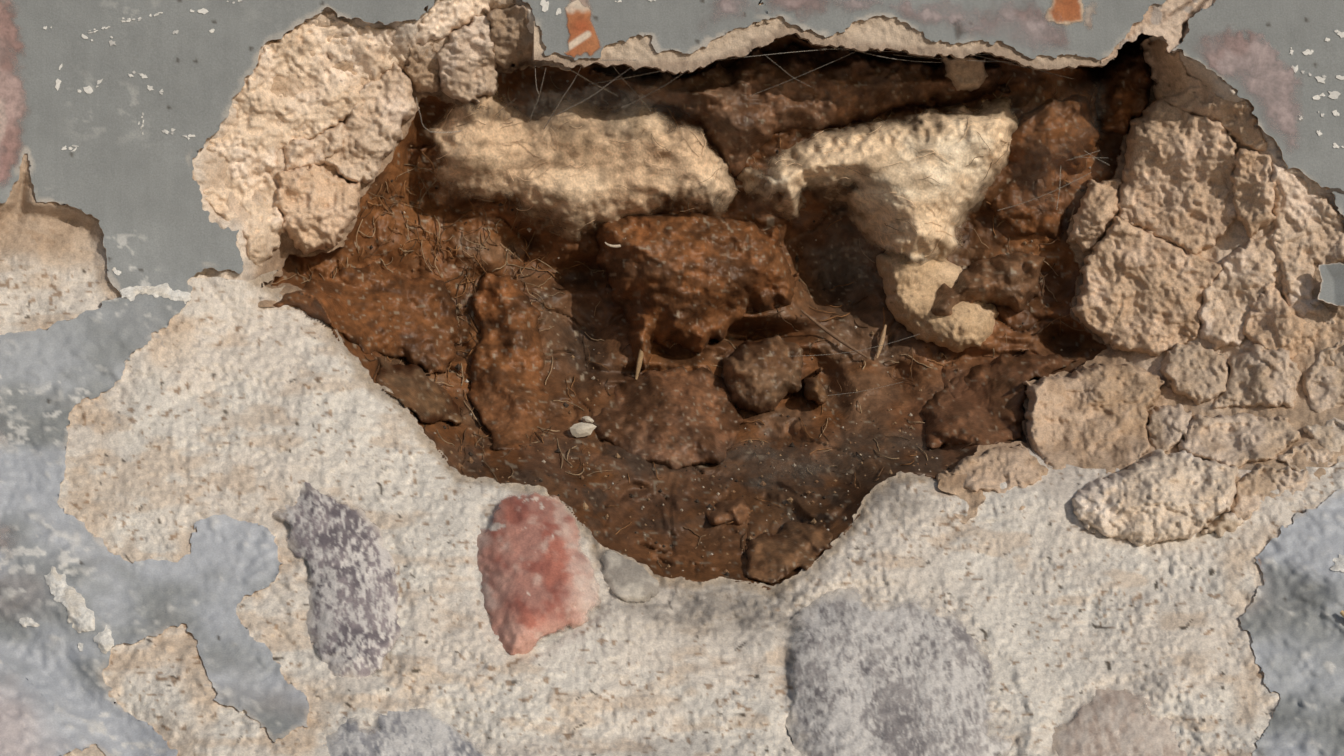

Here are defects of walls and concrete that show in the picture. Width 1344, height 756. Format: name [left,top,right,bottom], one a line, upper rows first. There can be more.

peeling [82,12,163,46]
rust [565,0,600,57]
rust [1045,0,1084,25]
crack [1101,0,1216,63]
water stain [0,0,26,181]
spalling [0,154,121,335]
spalling [192,0,1344,584]
spalling [57,270,1344,756]
peeling [19,617,40,628]